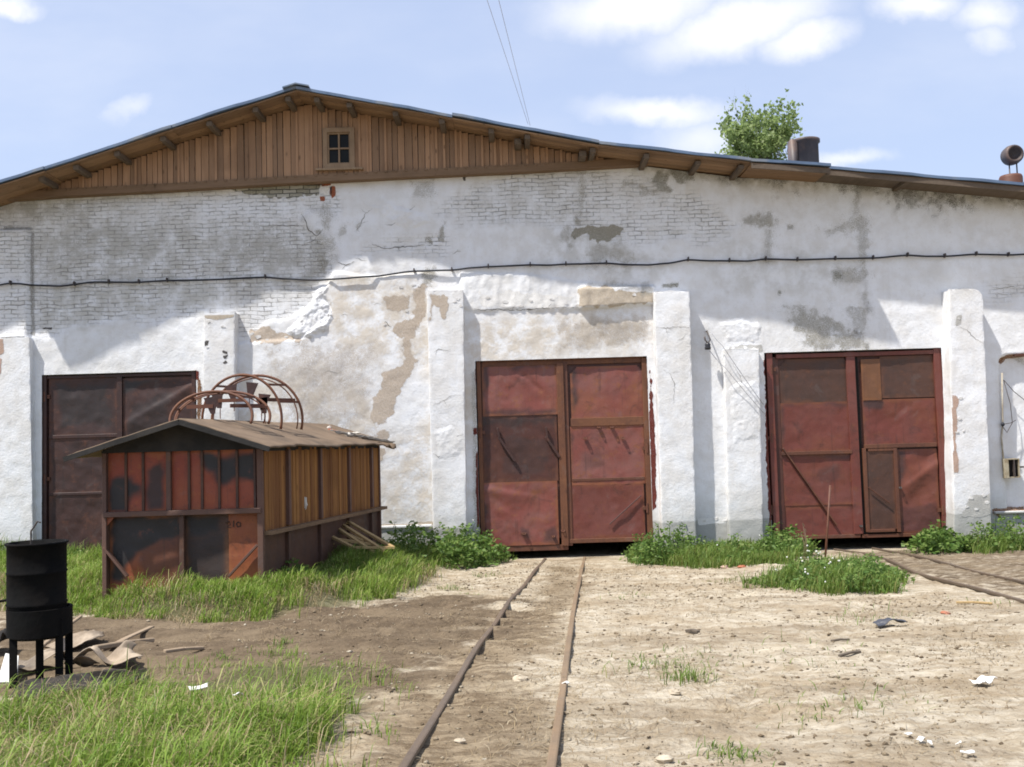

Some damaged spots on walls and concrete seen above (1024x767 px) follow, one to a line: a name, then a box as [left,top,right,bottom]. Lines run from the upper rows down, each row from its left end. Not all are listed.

flaking render [249,283,462,461]
crack [338,206,420,268]
spalling [478,285,653,358]
water stain [774,188,881,352]